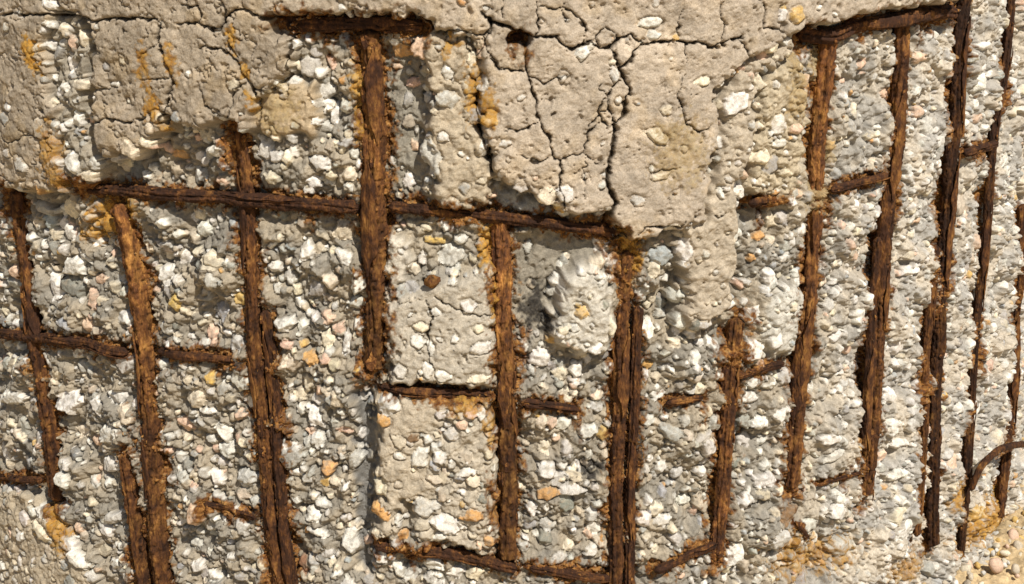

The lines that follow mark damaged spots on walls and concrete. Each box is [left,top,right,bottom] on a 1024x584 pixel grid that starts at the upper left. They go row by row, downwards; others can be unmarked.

crack [5,5,300,123]
crack [440,4,781,218]
rust [995,31,1013,125]
rust [0,446,60,488]
rust [0,267,137,451]
spalling [0,3,644,584]
rust [36,1,650,584]
rust [621,306,872,583]
spalling [621,0,1024,584]
rust [785,0,998,584]
rust [945,401,1017,559]
rust [1008,260,1024,332]